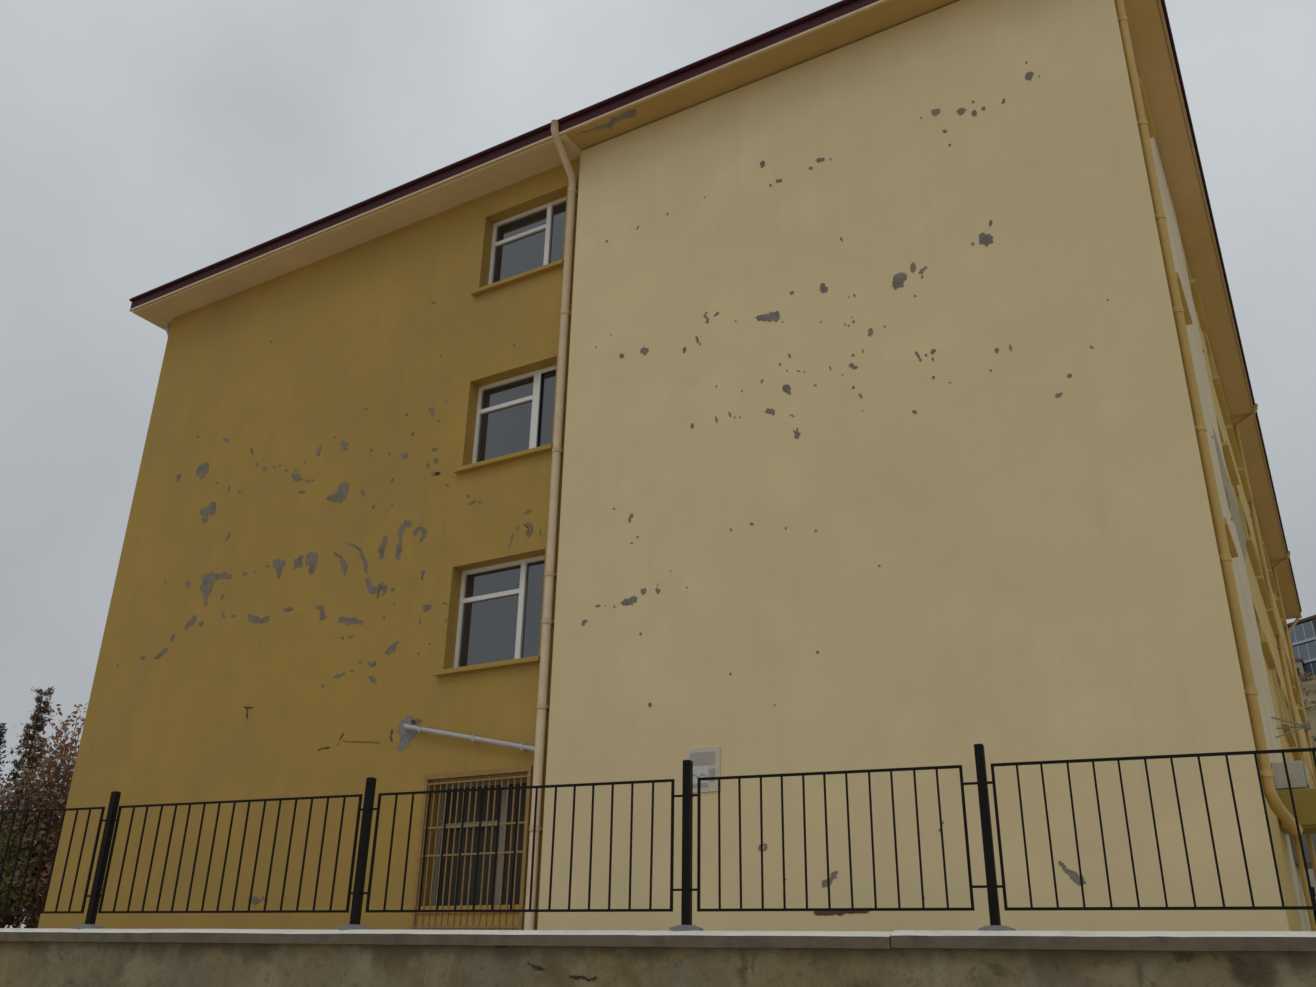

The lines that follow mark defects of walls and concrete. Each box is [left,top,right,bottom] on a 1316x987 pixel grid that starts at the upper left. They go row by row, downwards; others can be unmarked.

peeling [577,109,637,135]
peeling [971,220,993,247]
peeling [892,262,927,297]
peeling [755,311,783,322]
peeling [829,317,886,411]
peeling [765,408,801,439]
peeling [250,436,349,494]
peeling [326,482,375,509]
peeling [141,520,427,660]
peeling [320,641,399,688]
peeling [1058,861,1086,886]